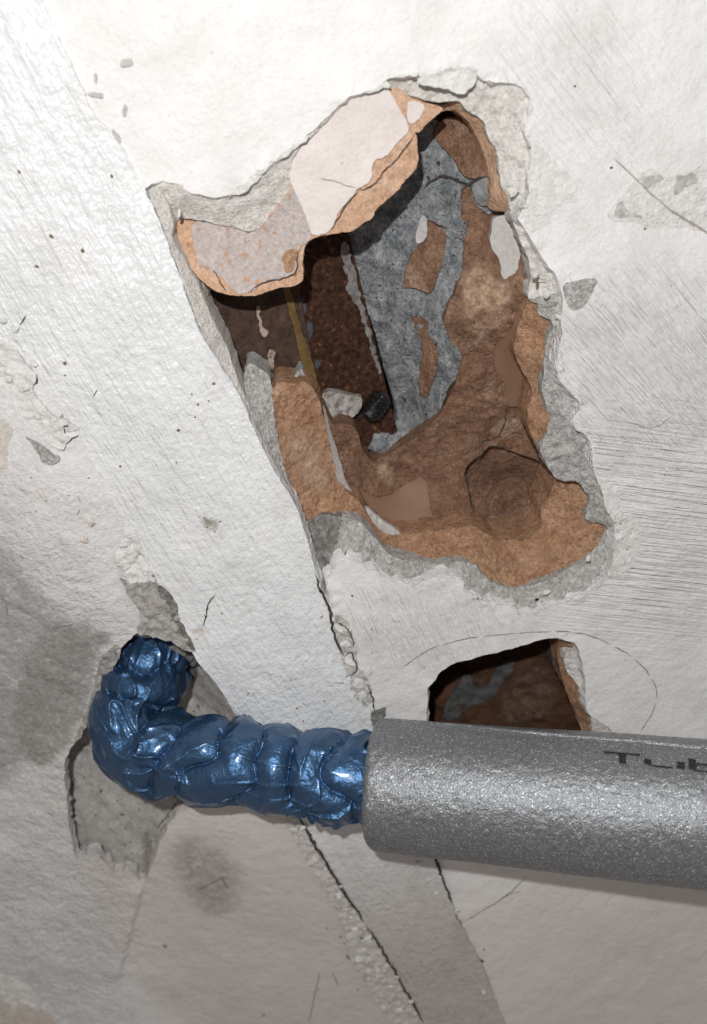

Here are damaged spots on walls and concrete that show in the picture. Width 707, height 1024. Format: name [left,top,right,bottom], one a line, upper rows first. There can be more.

spalling [149,106,341,234]
spalling [272,66,641,617]
spalling [68,645,185,873]
spalling [114,524,195,652]
spalling [178,665,236,721]
crack [315,574,375,712]
spalling [547,638,610,732]
crack [283,817,424,1024]